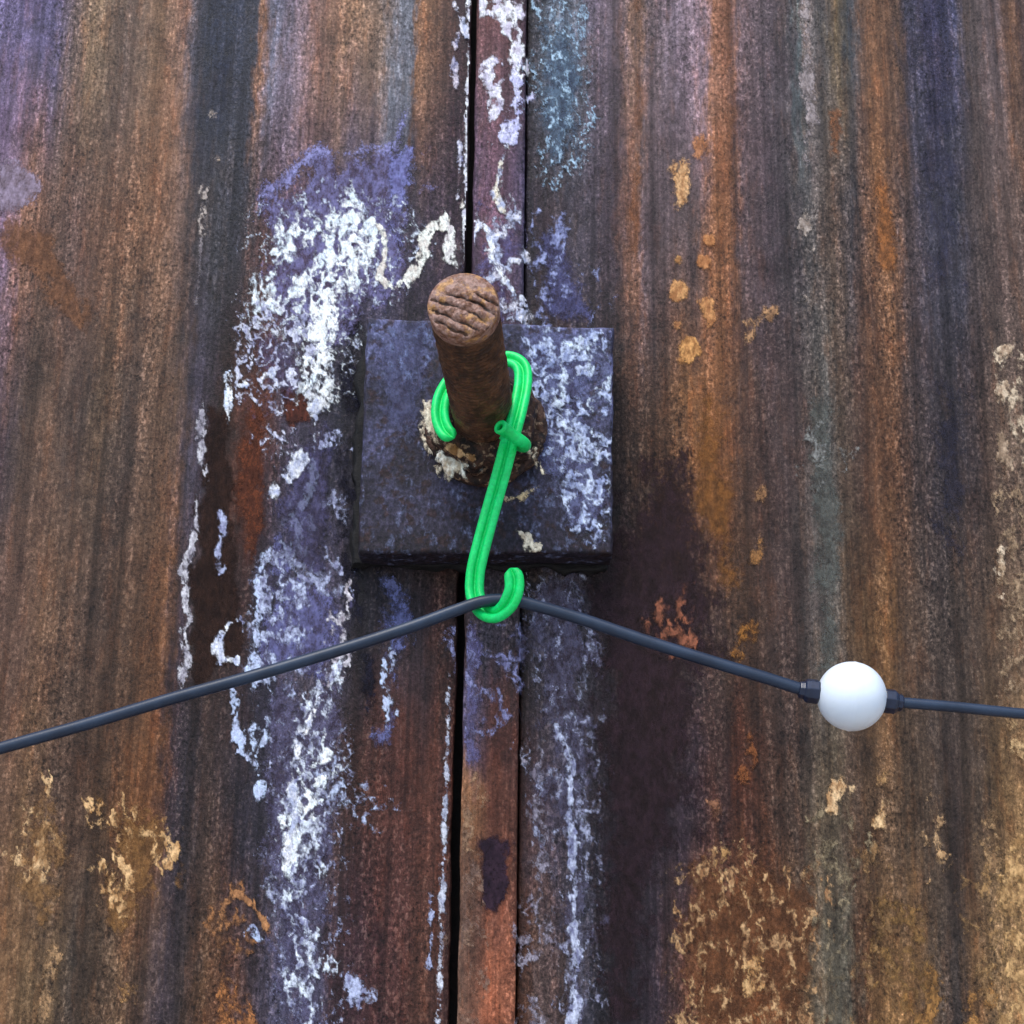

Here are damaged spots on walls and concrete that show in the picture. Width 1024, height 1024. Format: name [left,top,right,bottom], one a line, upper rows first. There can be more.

corrosion [281,386,312,428]
corrosion [232,405,268,560]
corrosion [645,597,698,659]
peeling [84,792,180,932]